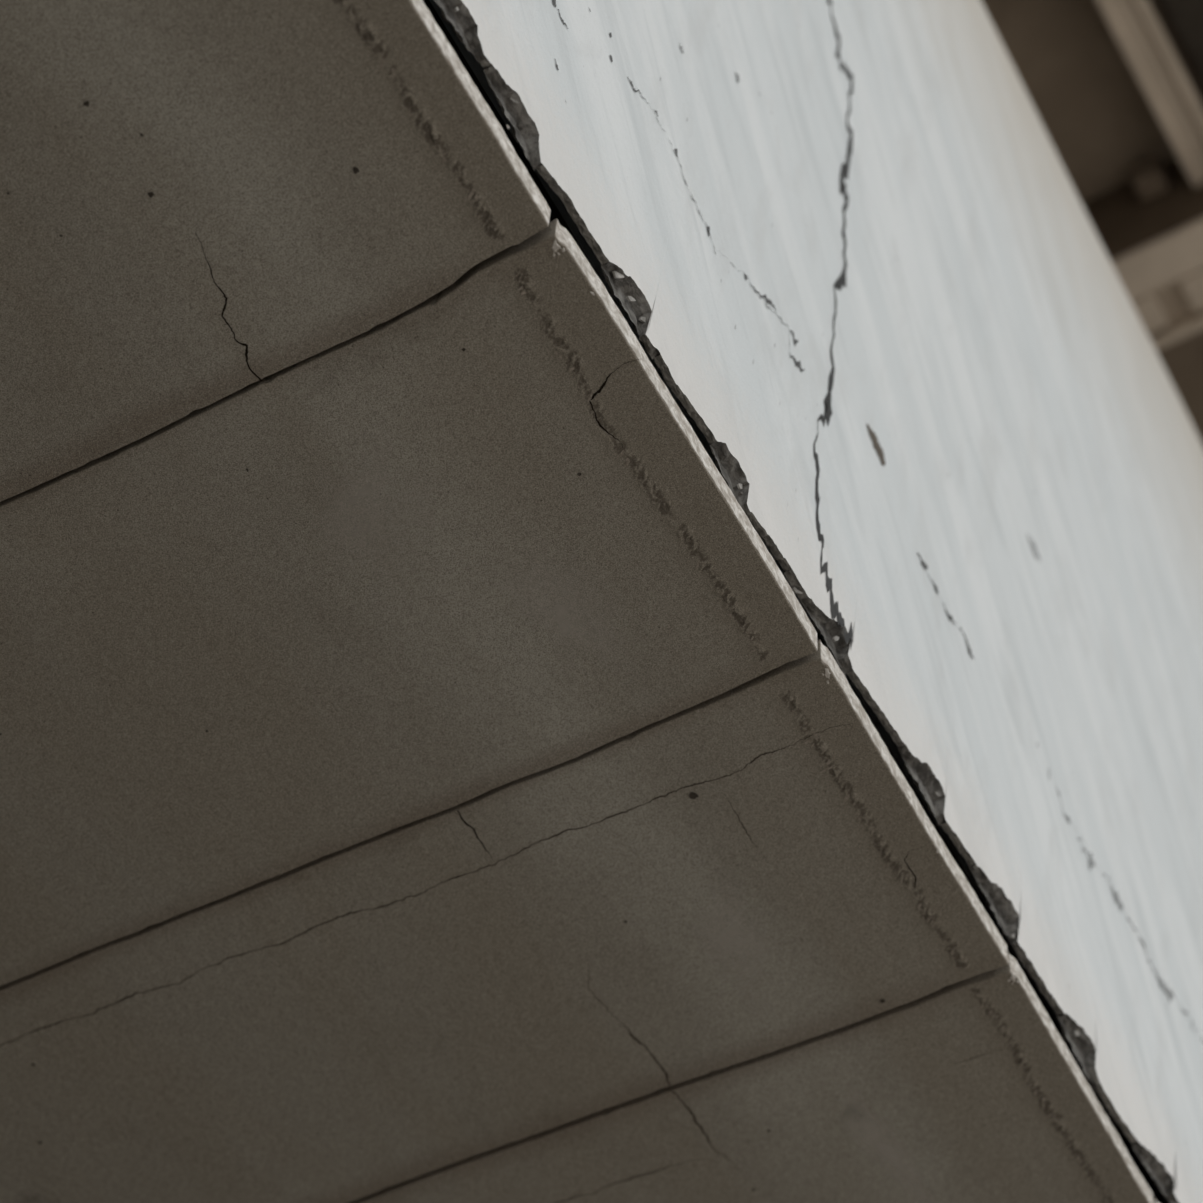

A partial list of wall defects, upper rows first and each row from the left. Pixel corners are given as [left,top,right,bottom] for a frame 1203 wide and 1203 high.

crack [195,231,262,381]
crack [552,0,853,648]
crack [0,723,852,1046]
crack [556,967,743,1203]